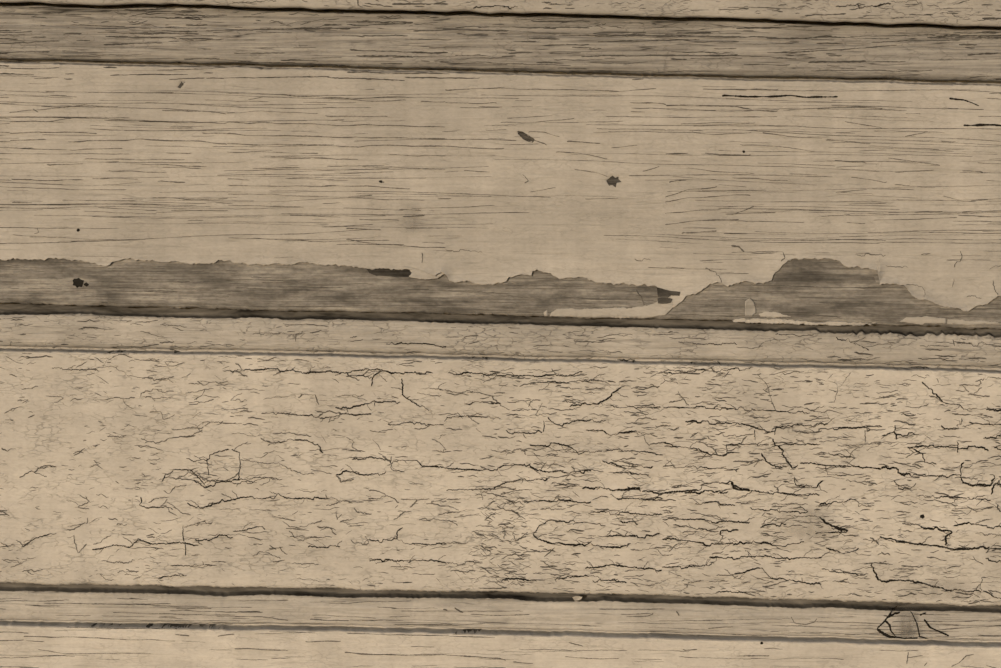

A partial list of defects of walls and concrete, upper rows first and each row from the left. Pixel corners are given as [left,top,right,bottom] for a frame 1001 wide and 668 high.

crack [0,0,1001,299]
peeling [0,258,1001,329]
crack [0,317,1001,668]